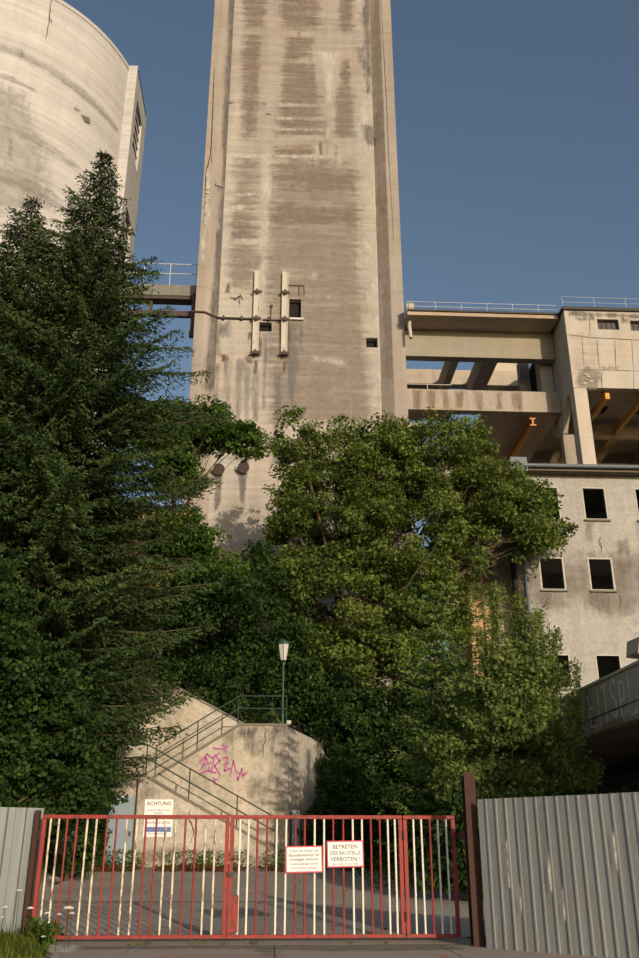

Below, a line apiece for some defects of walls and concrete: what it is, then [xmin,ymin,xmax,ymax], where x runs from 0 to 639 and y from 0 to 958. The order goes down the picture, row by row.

damp [207,0,386,437]